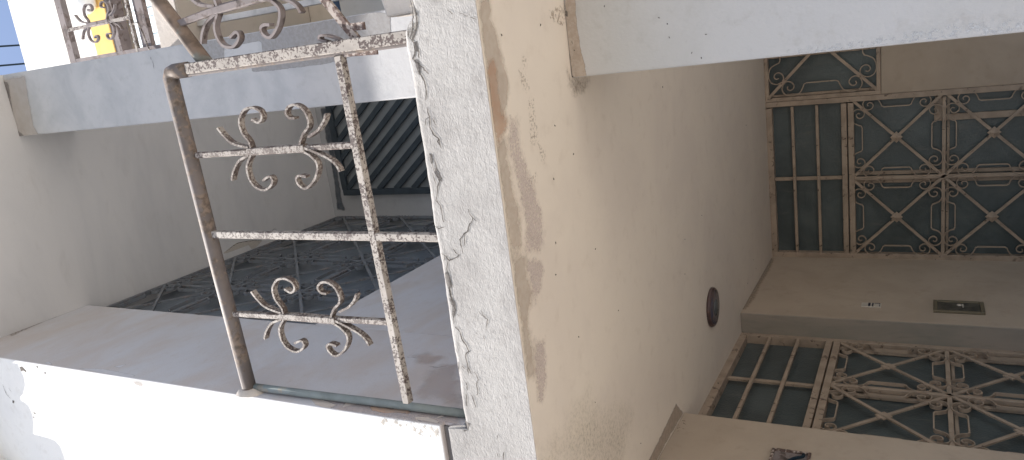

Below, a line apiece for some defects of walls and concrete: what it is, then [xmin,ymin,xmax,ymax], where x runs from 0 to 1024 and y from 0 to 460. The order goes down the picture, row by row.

leakage [480,0,508,116]
crack [407,0,488,407]
leakage [498,141,534,374]